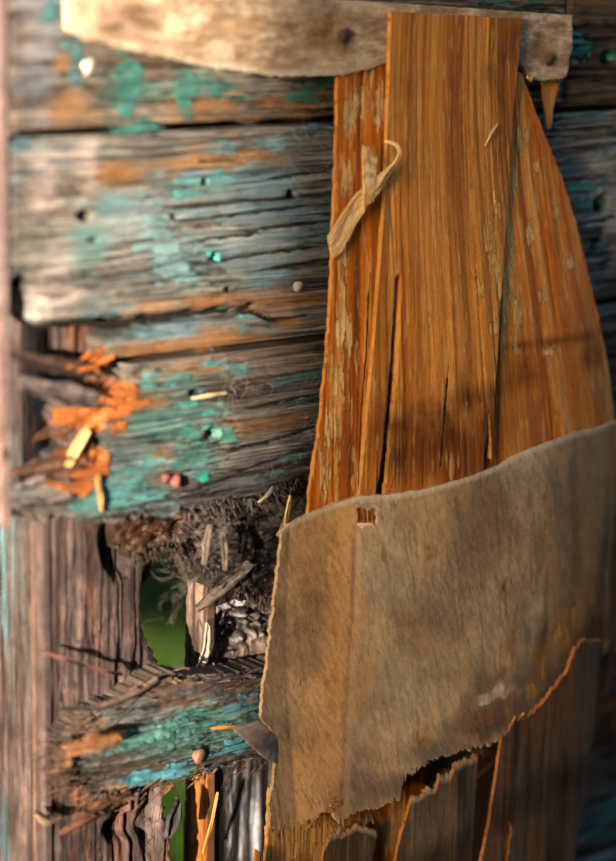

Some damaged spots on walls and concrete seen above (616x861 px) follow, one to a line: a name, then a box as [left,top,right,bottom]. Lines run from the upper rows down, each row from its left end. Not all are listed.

peeling [40,0,63,24]
peeling [59,32,88,97]
peeling [98,48,158,134]
peeling [172,69,263,120]
peeling [282,78,335,103]
peeling [139,372,192,389]
peeling [202,358,322,389]
crack [358,279,400,494]
crack [440,366,449,467]
crack [485,281,503,465]
peeling [68,400,241,520]
peeling [106,692,259,787]